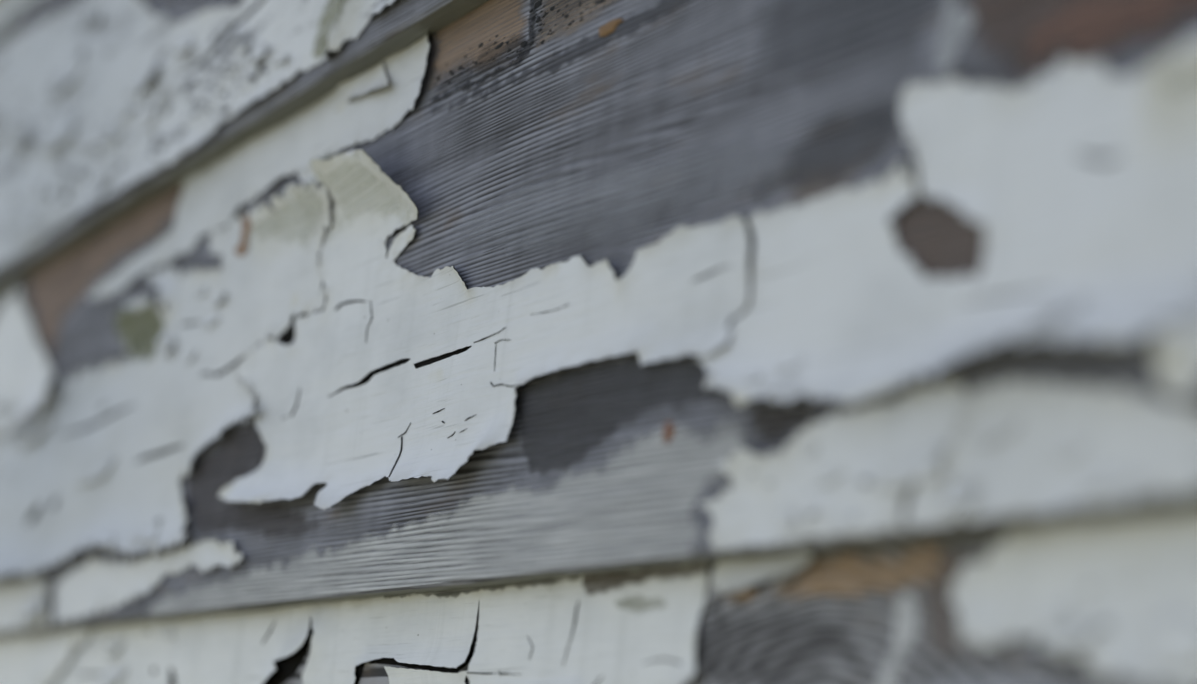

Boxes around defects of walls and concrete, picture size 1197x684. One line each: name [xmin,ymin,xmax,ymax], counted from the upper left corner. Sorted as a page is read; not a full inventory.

peeling [0,0,749,632]
crack [692,215,755,329]
peeling [698,33,1197,408]
peeling [0,551,815,684]
crack [355,629,533,684]
crack [563,600,579,665]